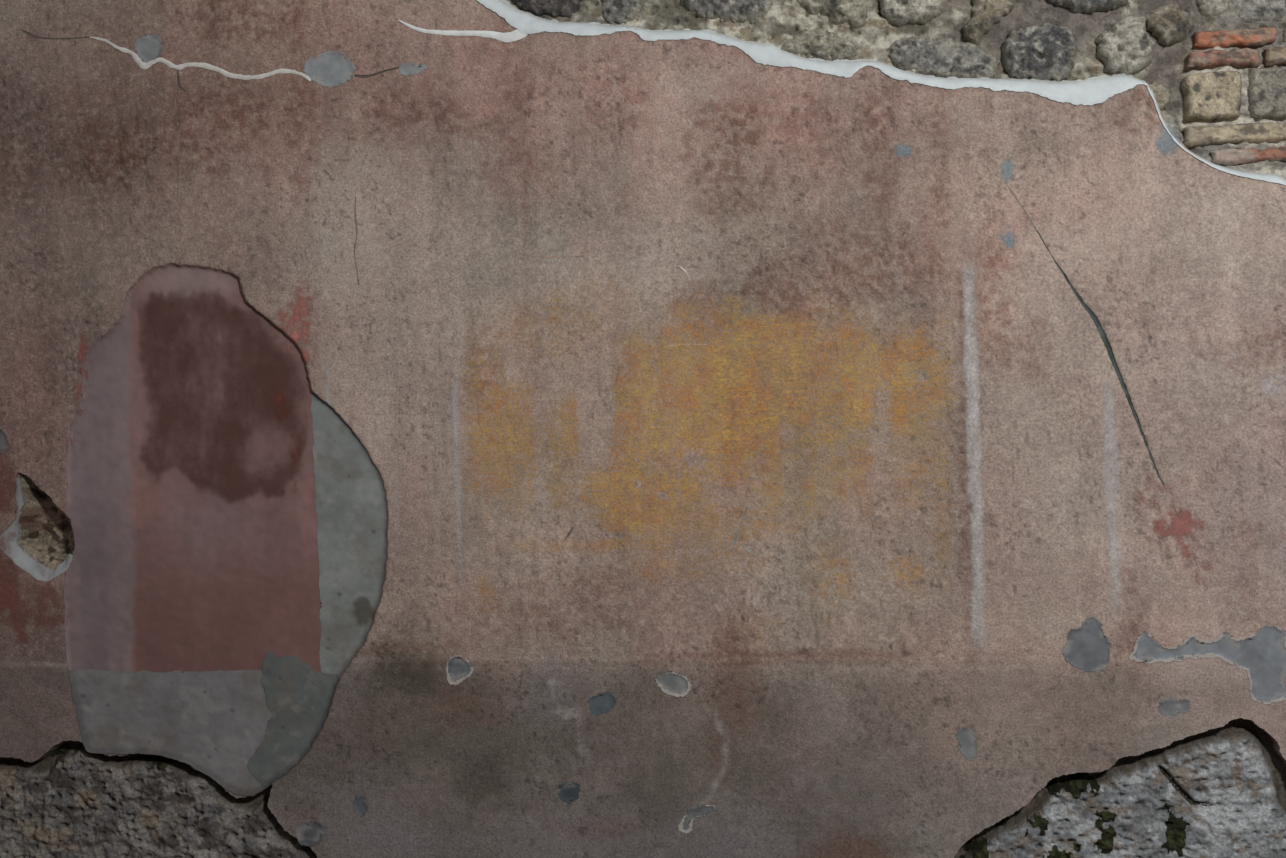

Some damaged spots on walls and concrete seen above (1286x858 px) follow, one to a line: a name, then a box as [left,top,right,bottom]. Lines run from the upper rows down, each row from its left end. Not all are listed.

crack [22,30,311,92]
crack [354,67,399,78]
spalling [507,0,1286,179]
leakage [144,287,312,500]
crack [1007,185,1200,571]
flaking render [0,263,389,858]
spalling [1129,625,1286,704]
spalling [954,718,1286,858]